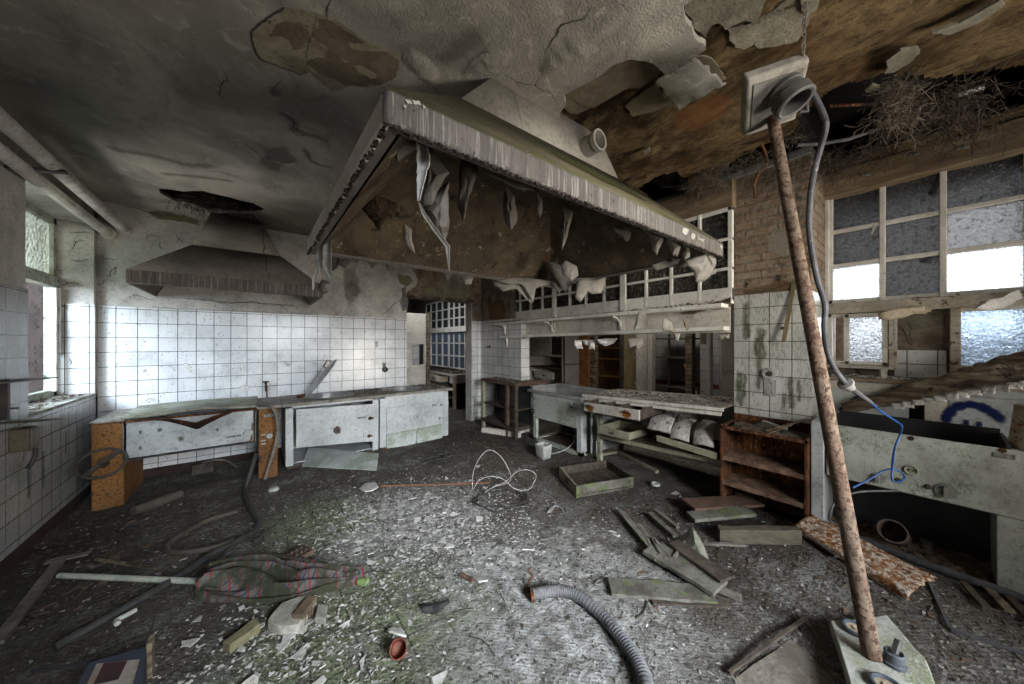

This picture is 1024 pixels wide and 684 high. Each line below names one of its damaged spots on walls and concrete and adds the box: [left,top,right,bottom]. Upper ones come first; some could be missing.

crack [272,0,333,168]
flaking render [250,7,400,92]
crack [505,7,592,128]
flaking render [564,55,726,116]
flaking render [685,0,810,50]